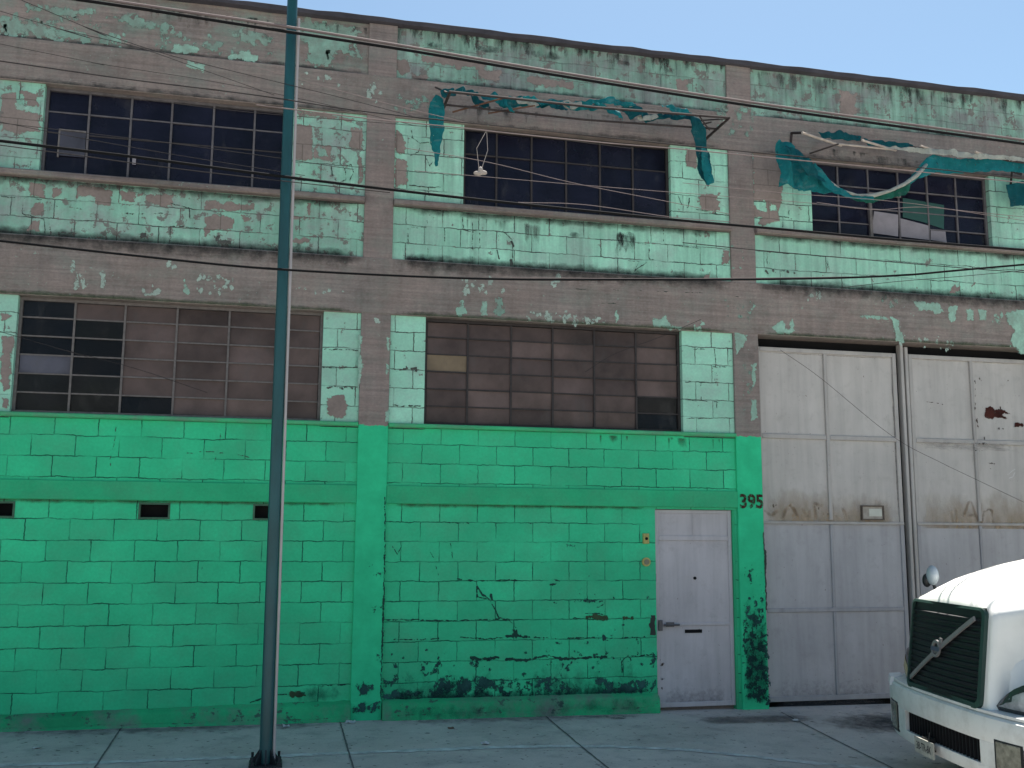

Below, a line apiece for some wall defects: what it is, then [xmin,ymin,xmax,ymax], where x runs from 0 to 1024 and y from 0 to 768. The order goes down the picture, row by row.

peeling [0,90,42,135]
peeling [296,111,364,184]
peeling [76,185,175,215]
peeling [204,200,255,244]
peeling [456,276,505,316]
peeling [526,310,619,327]
peeling [0,336,15,408]
peeling [326,332,364,418]
corrosion [984,406,1024,429]
crack [380,497,652,700]
spalling [352,593,664,713]
spalling [742,597,771,706]